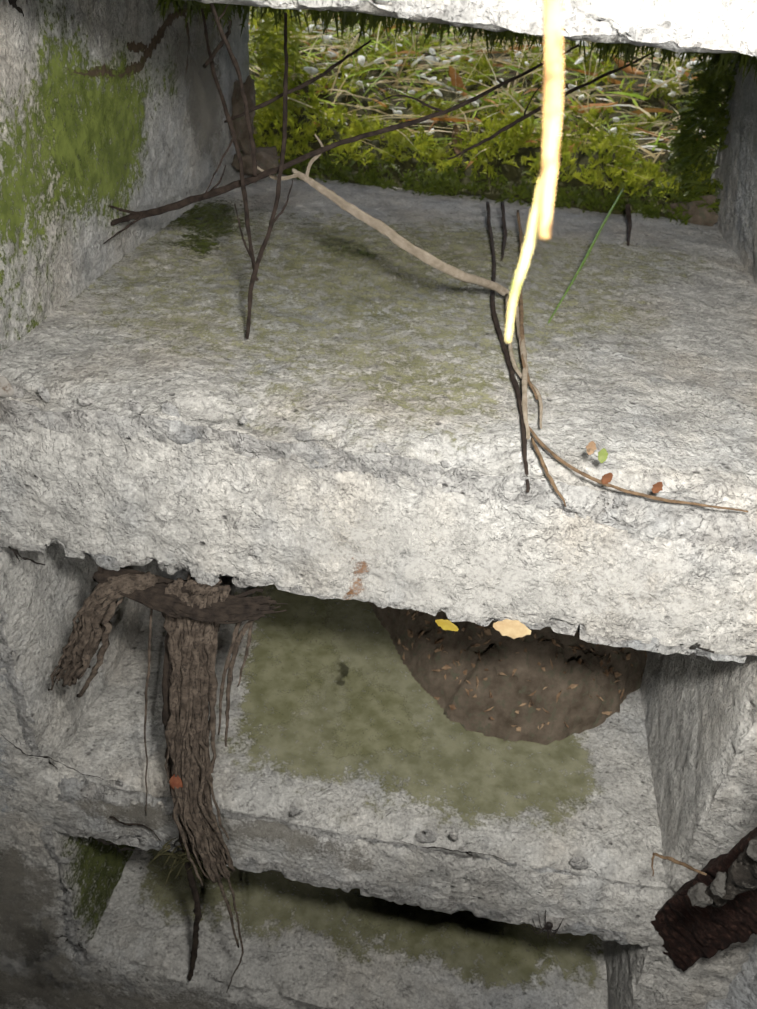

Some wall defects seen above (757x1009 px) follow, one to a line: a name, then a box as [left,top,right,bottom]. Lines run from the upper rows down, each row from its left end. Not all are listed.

damp [36,67,127,218]
damp [76,836,129,905]